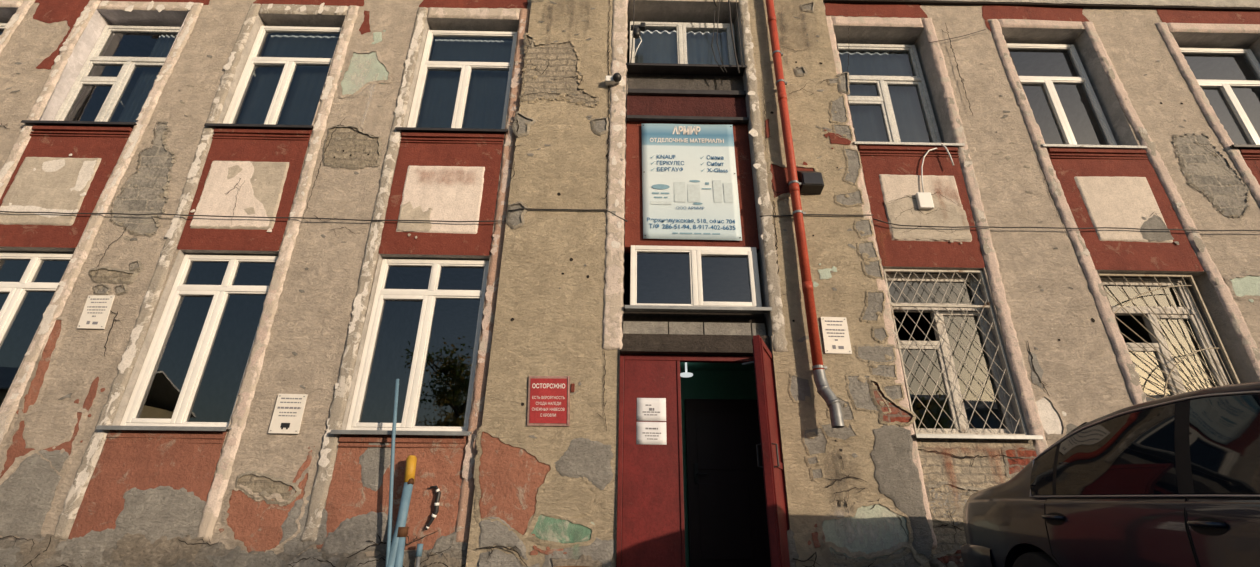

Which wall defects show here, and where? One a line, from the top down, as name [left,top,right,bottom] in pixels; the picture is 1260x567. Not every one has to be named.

flaking render [86,88,272,262]
flaking render [267,3,424,174]
flaking render [491,8,626,255]
crack [942,23,973,115]
peeling [348,187,386,351]
peeling [478,285,496,363]
crack [0,536,82,567]
peeling [211,383,339,554]
crack [288,530,527,567]
peeling [461,403,600,555]
peeling [808,499,927,567]
peeling [1002,347,1067,478]